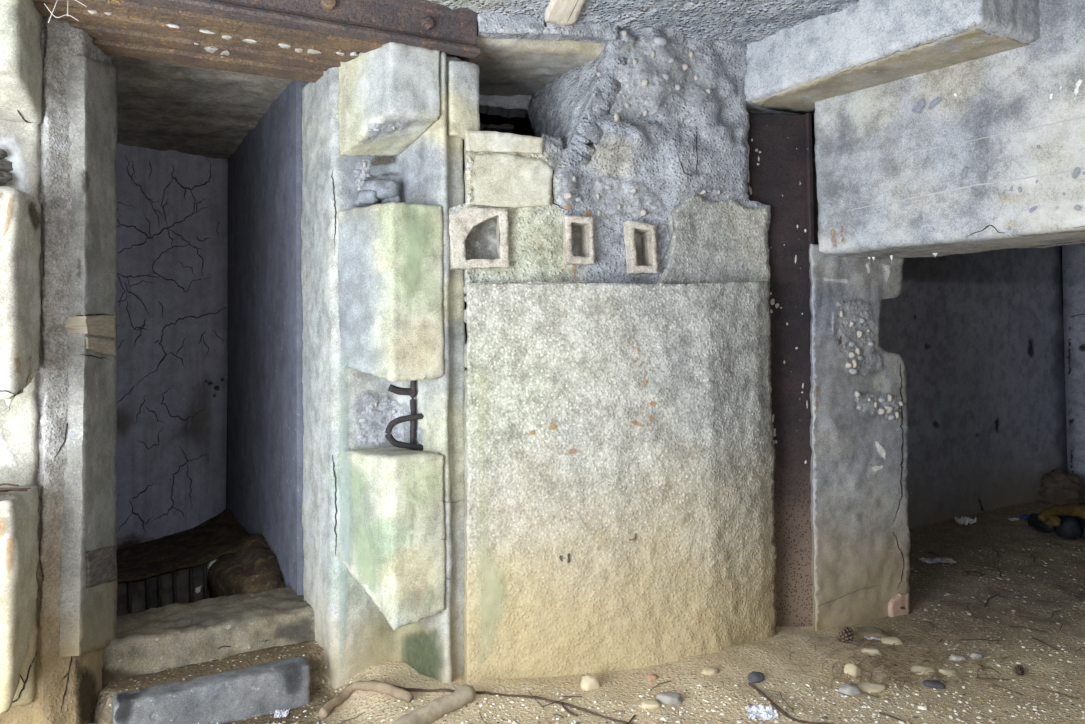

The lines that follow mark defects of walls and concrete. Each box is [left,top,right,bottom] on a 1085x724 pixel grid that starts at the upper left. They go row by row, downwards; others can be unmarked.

spalling [597,27,716,122]
spalling [559,171,668,261]
crack [76,156,227,534]
spalling [836,299,884,377]
spalling [854,391,903,420]
crack [818,364,904,607]